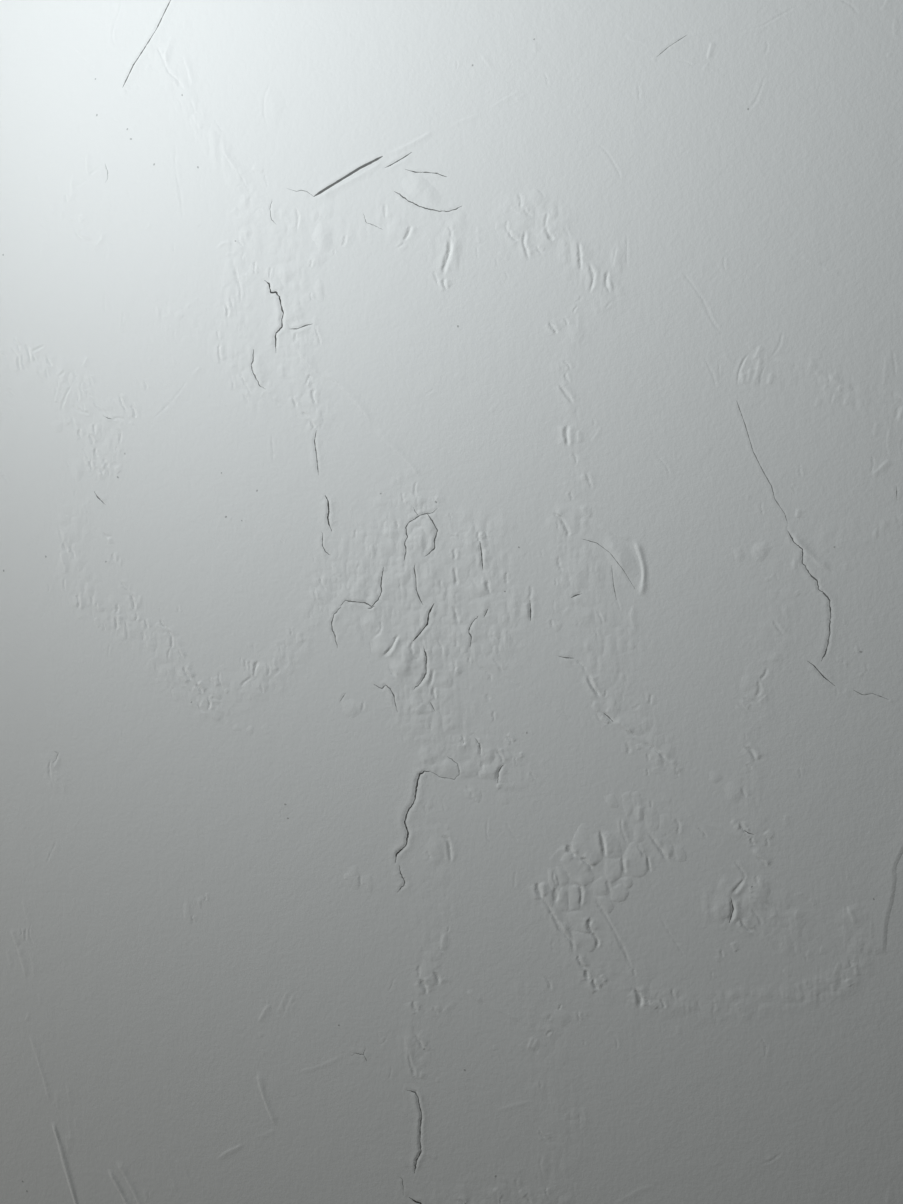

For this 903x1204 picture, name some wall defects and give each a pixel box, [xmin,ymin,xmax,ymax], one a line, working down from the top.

crack [118,0,181,92]
crack [242,271,316,393]
crack [732,395,843,691]
crack [387,762,439,898]
crack [399,1082,432,1204]